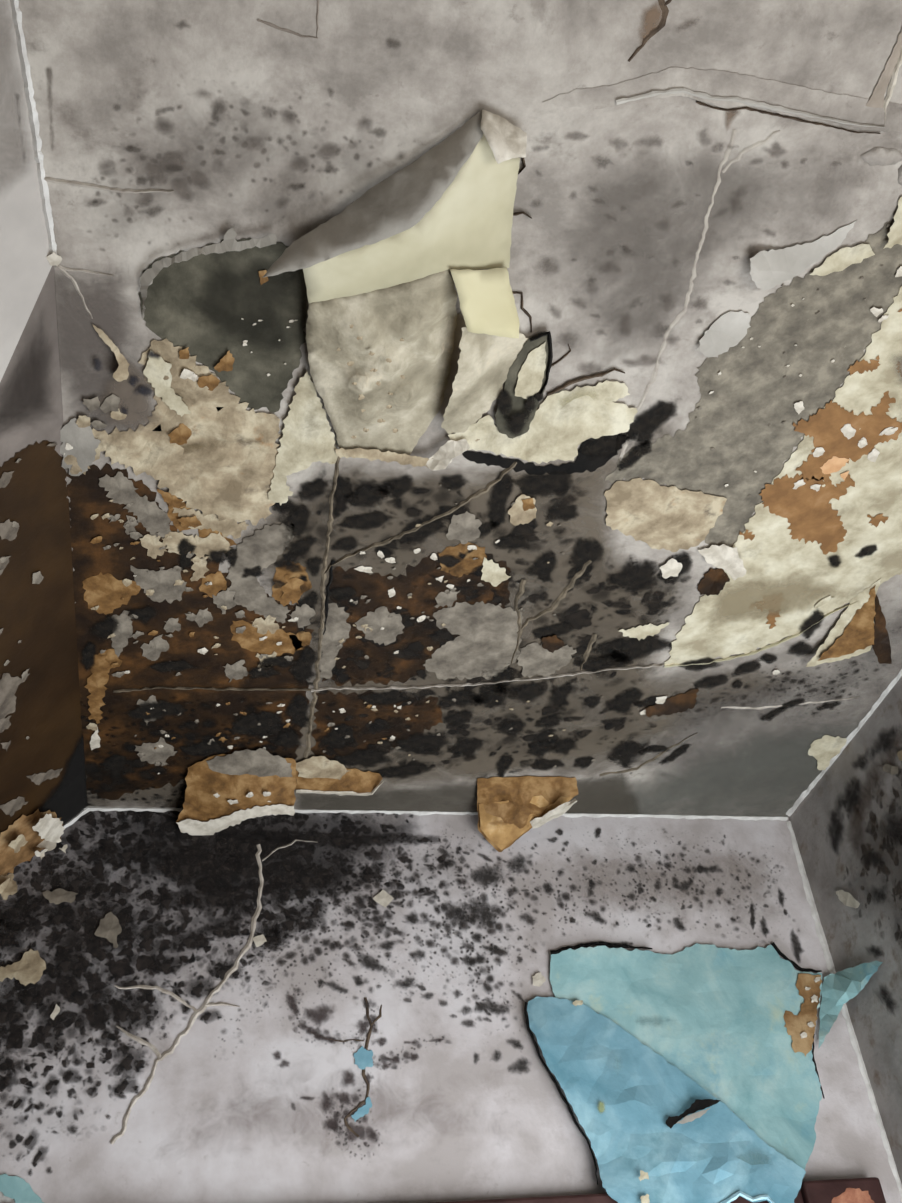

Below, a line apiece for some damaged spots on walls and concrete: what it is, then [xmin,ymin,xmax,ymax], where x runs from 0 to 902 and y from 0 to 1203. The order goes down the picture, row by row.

water stain [102,145,208,222]
water stain [214,104,371,181]
peeling [750,221,875,292]
peeling [696,311,751,358]
peeling [0,519,19,541]
peeling [0,660,30,751]
peeling [26,768,63,785]
water stain [0,401,902,1175]
peeling [0,796,68,900]
crack [110,839,318,1145]
crack [290,989,444,1141]
peeling [524,941,883,1203]